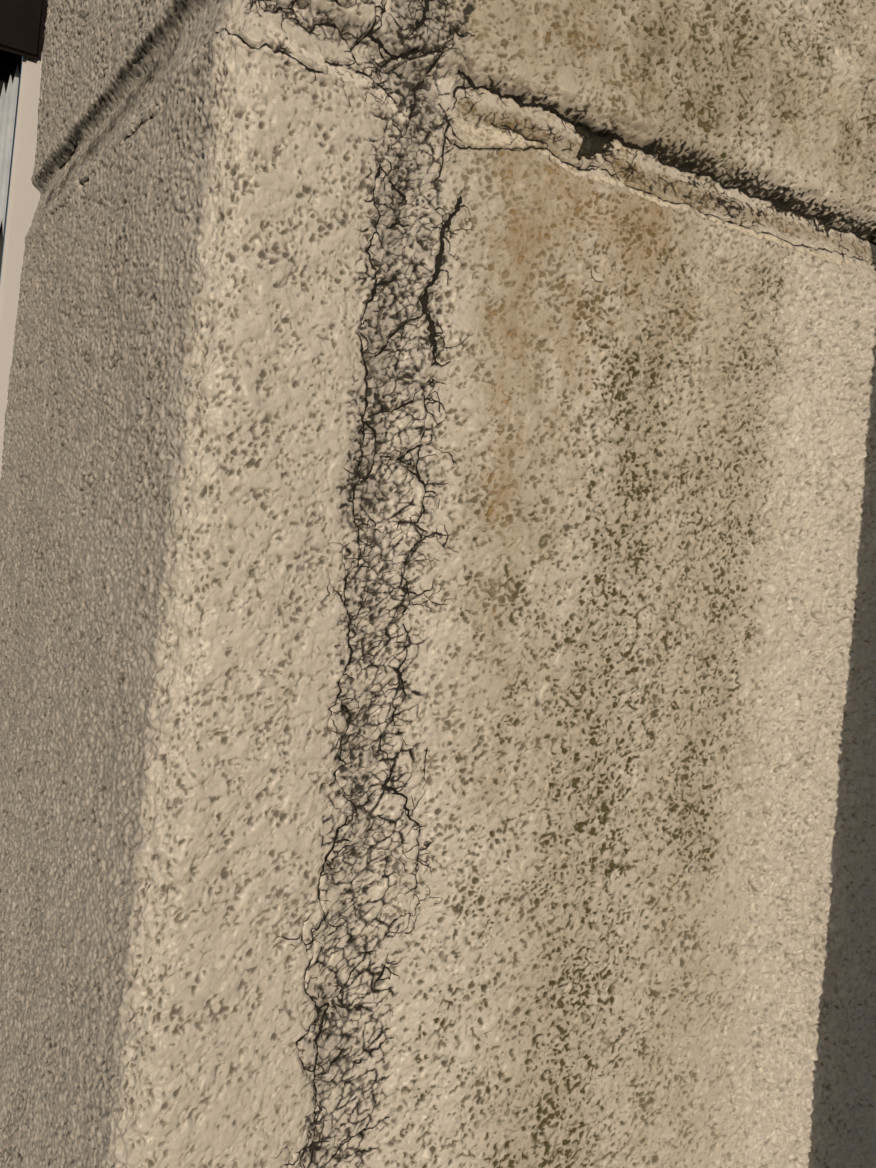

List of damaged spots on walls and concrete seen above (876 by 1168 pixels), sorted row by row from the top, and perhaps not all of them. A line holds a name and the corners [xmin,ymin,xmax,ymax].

crack [207,0,876,1168]